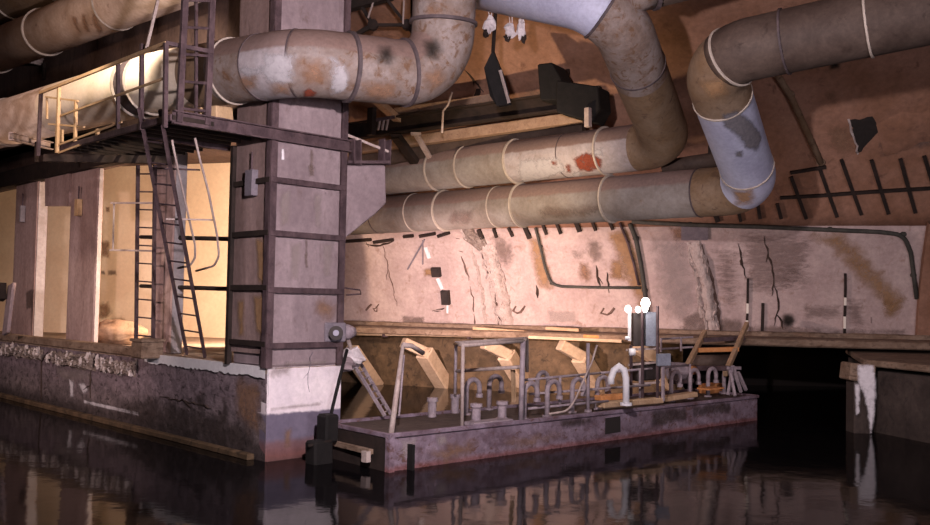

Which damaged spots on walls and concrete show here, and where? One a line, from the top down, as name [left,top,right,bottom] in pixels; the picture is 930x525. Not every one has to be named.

spalling [847,116,878,155]
crack [366,241,397,302]
crack [456,238,476,324]
crack [738,244,746,277]
crack [764,237,783,329]
spalling [0,341,138,377]